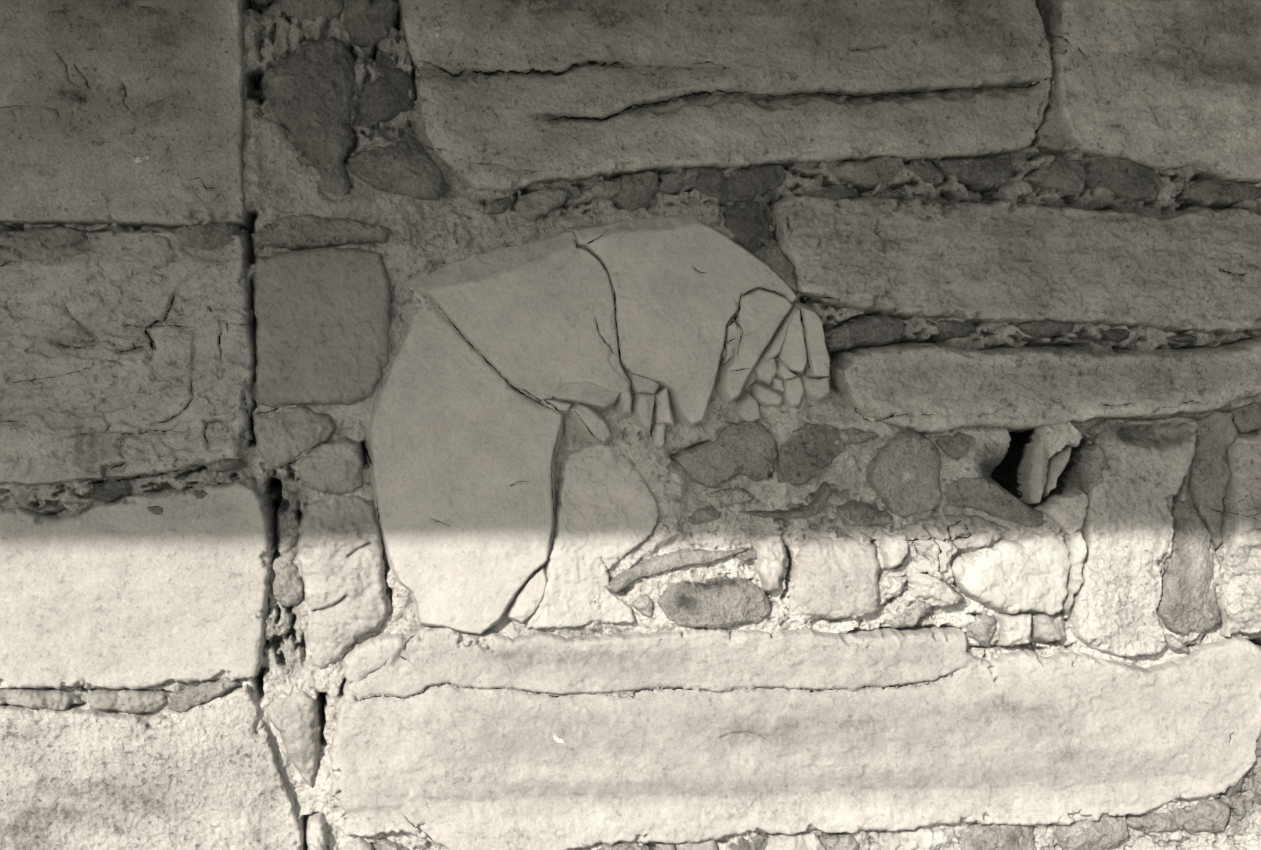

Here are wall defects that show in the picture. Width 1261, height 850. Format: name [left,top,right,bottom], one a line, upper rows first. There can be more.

crack [418,61,648,77]
crack [541,36,1196,122]
crack [12,293,184,383]
crack [57,307,294,484]
crack [430,297,608,594]
crack [573,228,655,440]
crack [719,288,873,379]
peeling [1016,421,1109,614]